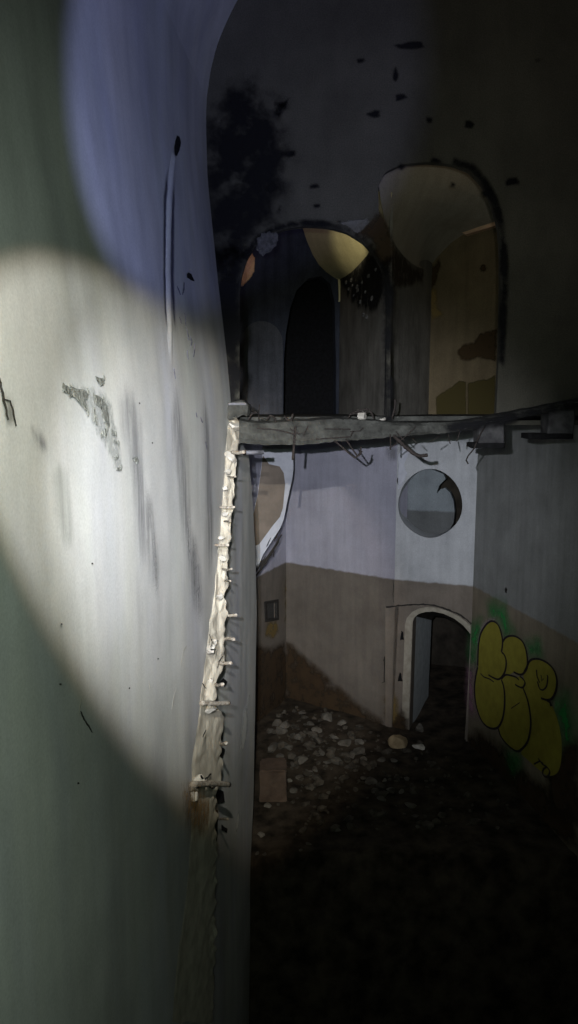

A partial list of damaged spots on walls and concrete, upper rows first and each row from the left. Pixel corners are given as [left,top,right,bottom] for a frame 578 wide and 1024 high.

flaking render [62,375,139,471]
spalling [172,416,246,1024]